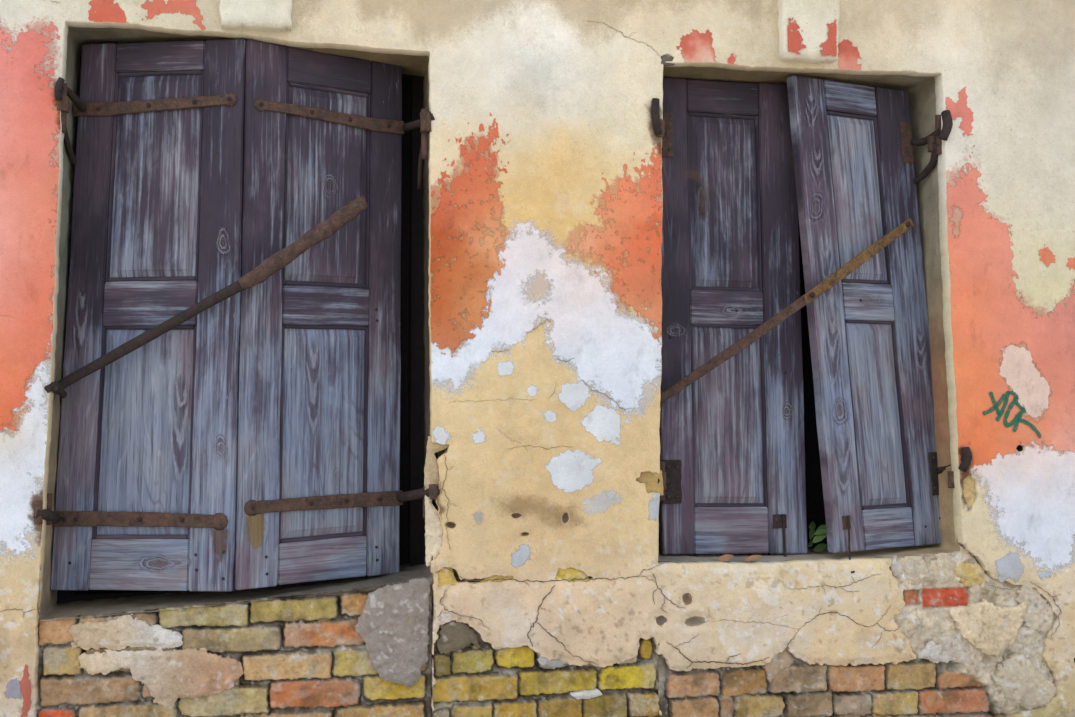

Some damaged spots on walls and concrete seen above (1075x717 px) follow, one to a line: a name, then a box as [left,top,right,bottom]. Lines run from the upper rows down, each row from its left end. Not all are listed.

peeling [88,0,128,23]
peeling [141,0,206,30]
peeling [661,29,737,66]
peeling [787,18,806,54]
peeling [819,14,862,70]
peeling [945,87,974,137]
peeling [0,21,60,563]
flaking render [4,145,1075,717]
crack [436,448,901,669]